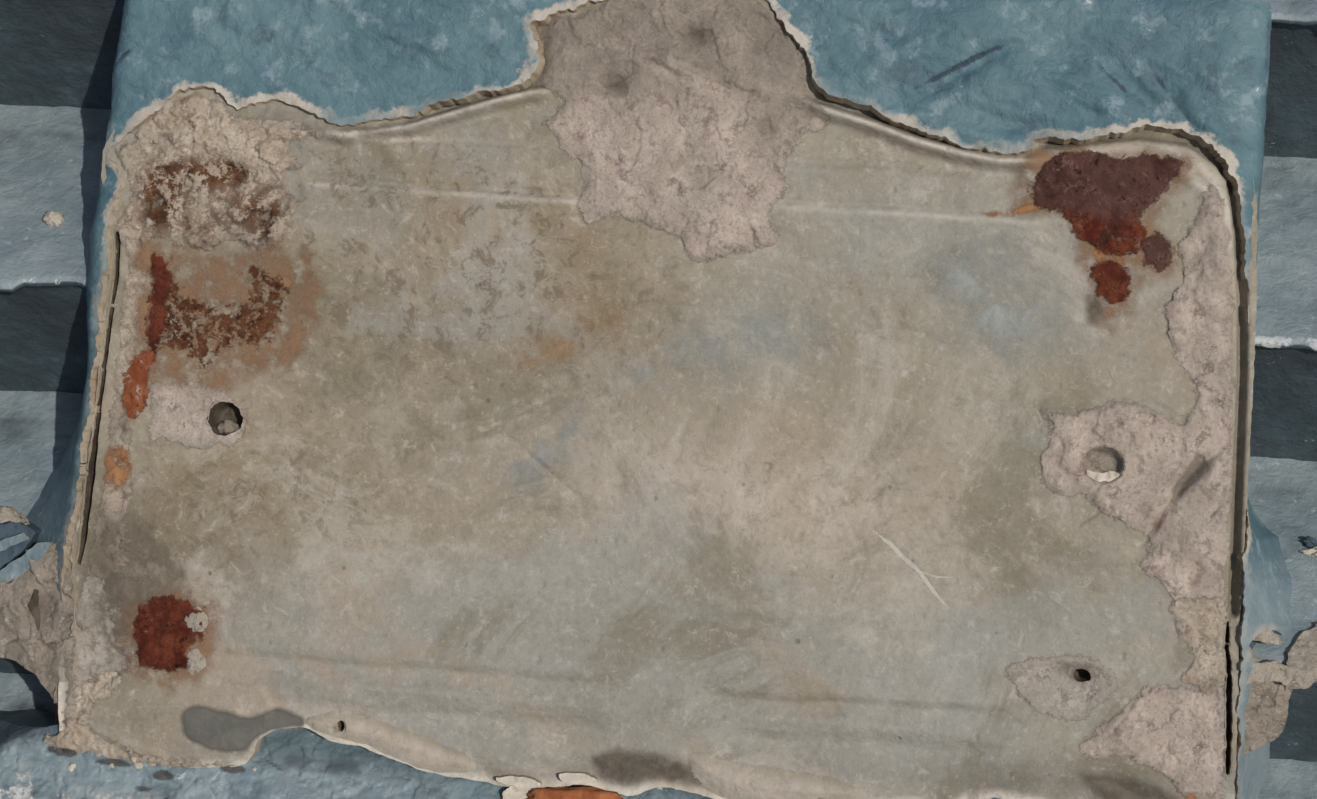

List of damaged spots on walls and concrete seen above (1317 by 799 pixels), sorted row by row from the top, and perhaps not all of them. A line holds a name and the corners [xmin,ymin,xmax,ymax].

spalling [536,0,830,263]
rust [987,150,1190,320]
rust [120,244,320,419]
spalling [0,92,337,768]
spalling [1005,184,1236,799]
peeling [1302,536,1317,549]
rust [128,591,212,684]
spalling [1244,624,1297,754]